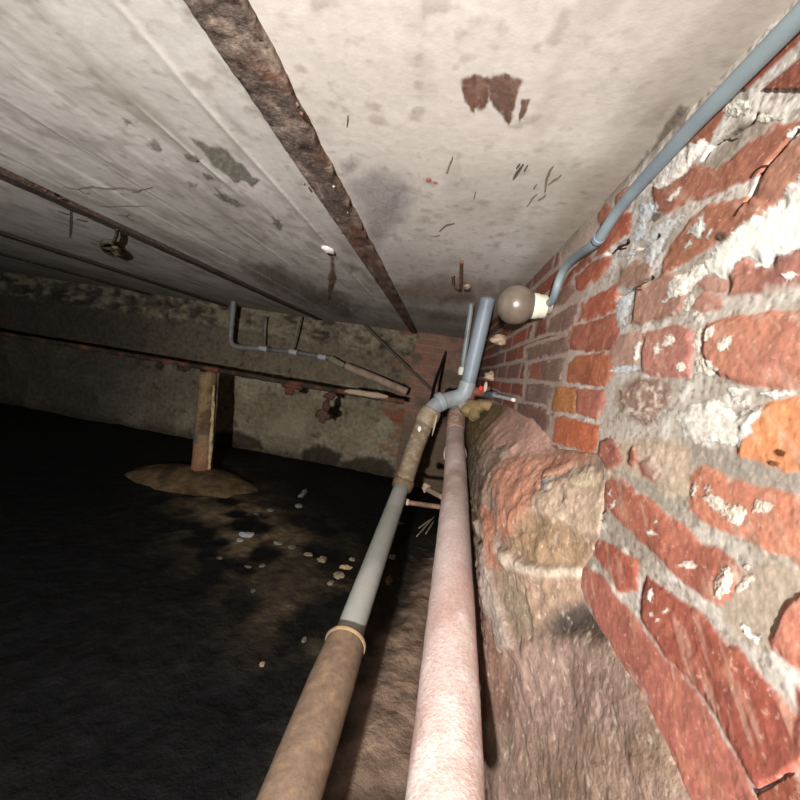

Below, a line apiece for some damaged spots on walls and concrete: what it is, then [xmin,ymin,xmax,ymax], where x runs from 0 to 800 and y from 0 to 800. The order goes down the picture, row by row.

leakage [648,106,687,155]
crack [751,160,774,178]
corrosion [328,254,336,300]